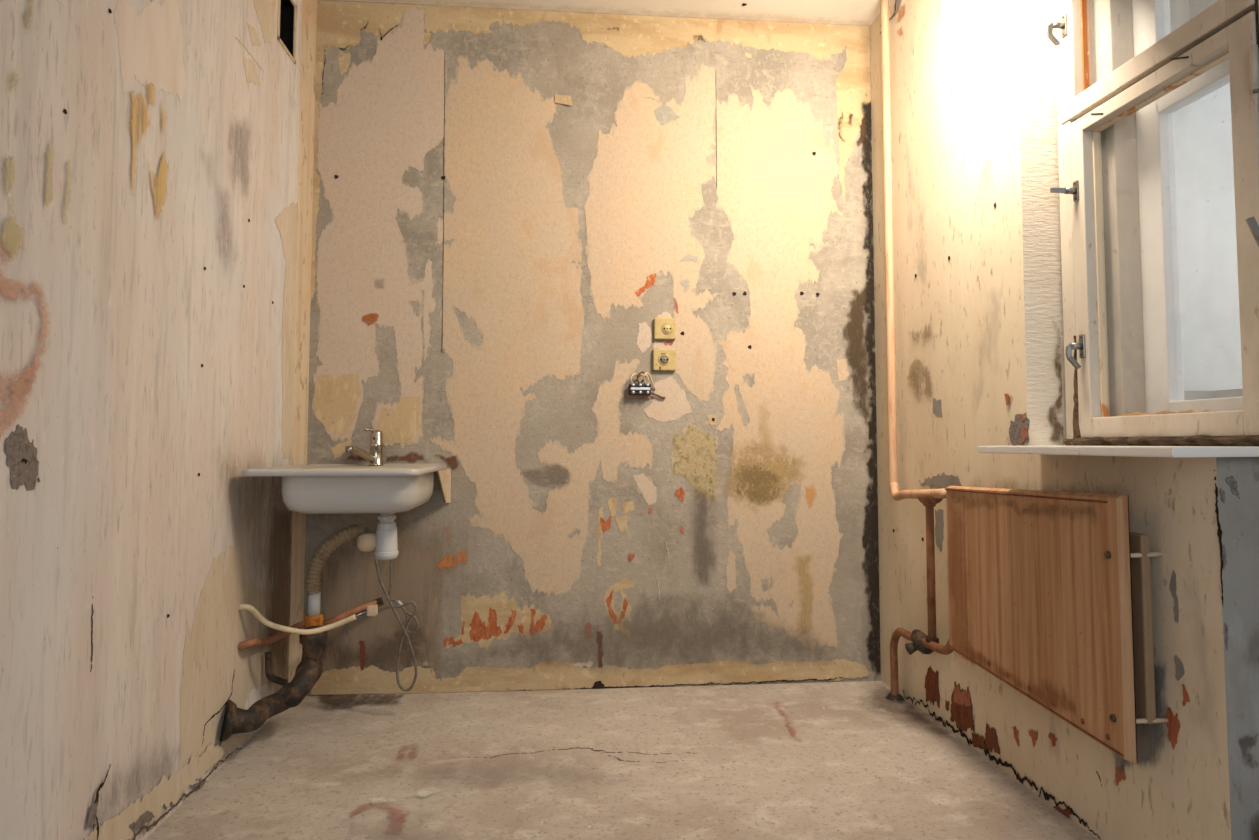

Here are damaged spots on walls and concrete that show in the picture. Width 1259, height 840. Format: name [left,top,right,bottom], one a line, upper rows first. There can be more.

peeling [635,273,656,297]
peeling [274,202,298,459]
peeling [637,298,678,355]
peeling [643,376,692,422]
peeling [836,359,849,381]
damp [839,102,881,673]
damp [730,448,798,503]
peeling [596,497,653,566]
peeling [443,588,551,649]
crack [133,675,242,840]
crack [903,690,1100,839]
crack [88,764,111,839]